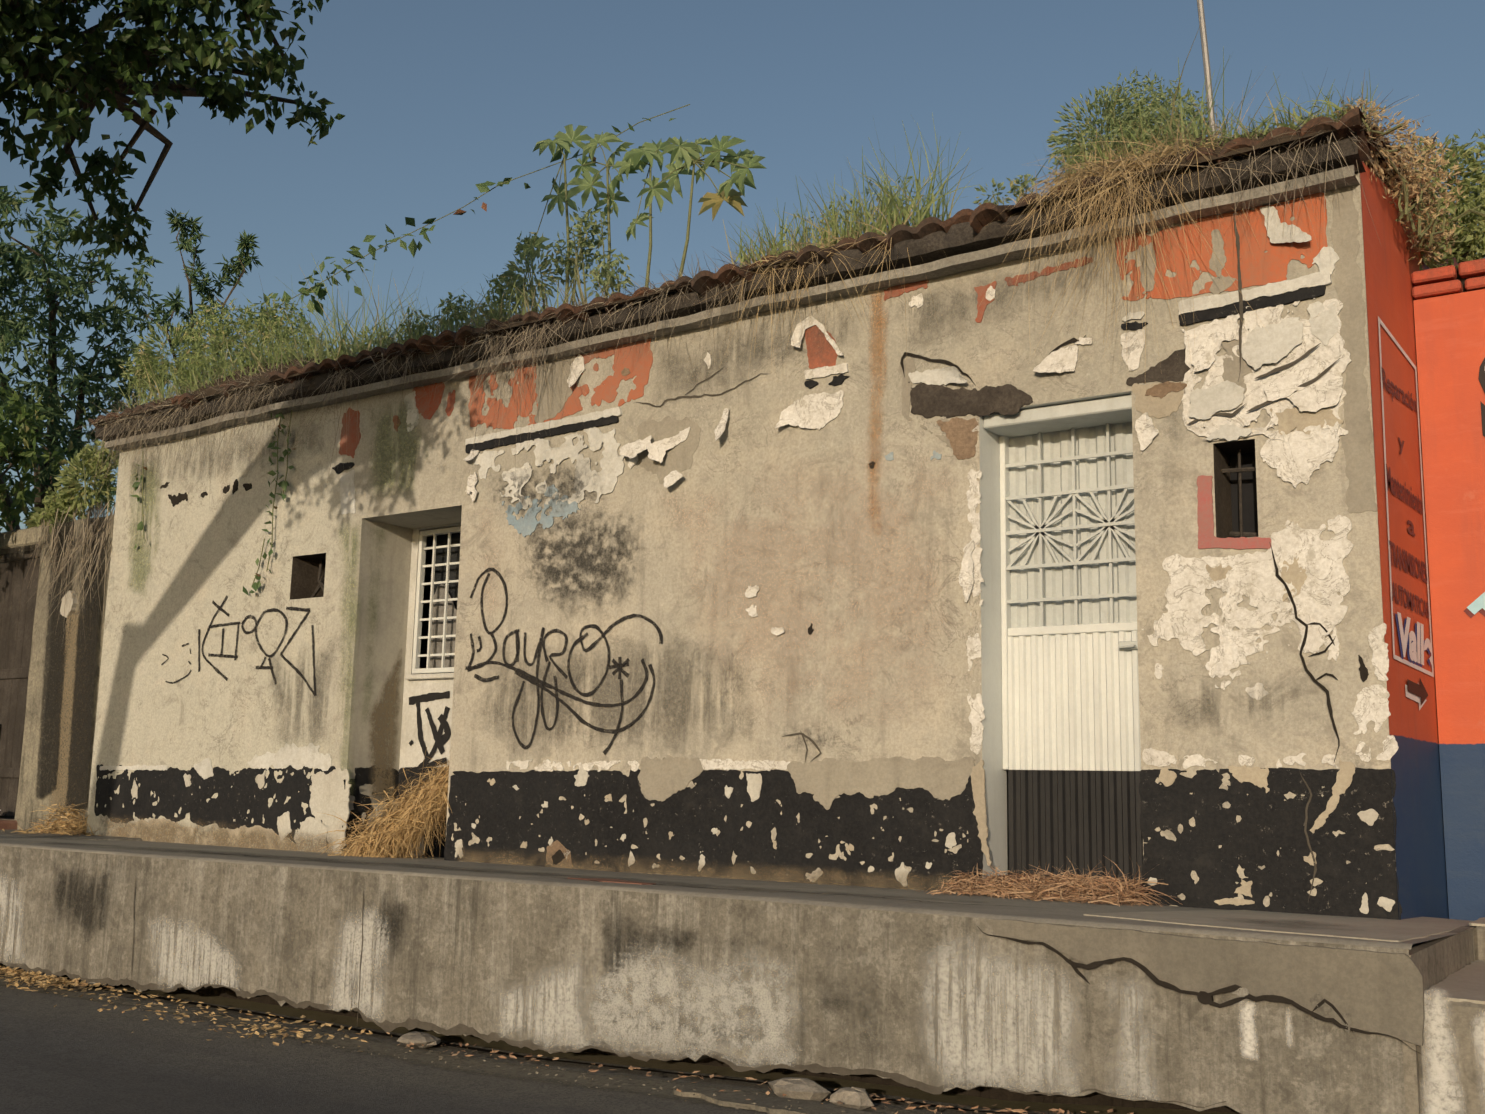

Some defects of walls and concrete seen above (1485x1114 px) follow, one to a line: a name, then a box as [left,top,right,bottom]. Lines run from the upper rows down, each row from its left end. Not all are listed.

peeling [445,338,729,537]
crack [634,366,772,407]
spalling [775,316,849,433]
peeling [1033,335,1093,373]
peeling [1115,186,1378,700]
water stain [532,514,631,601]
spalling [487,352,1033,869]
peeling [1142,623,1399,833]
crack [1269,542,1340,901]
peeling [100,743,387,854]
peeling [1214,879,1255,905]
peeling [1359,892,1395,914]